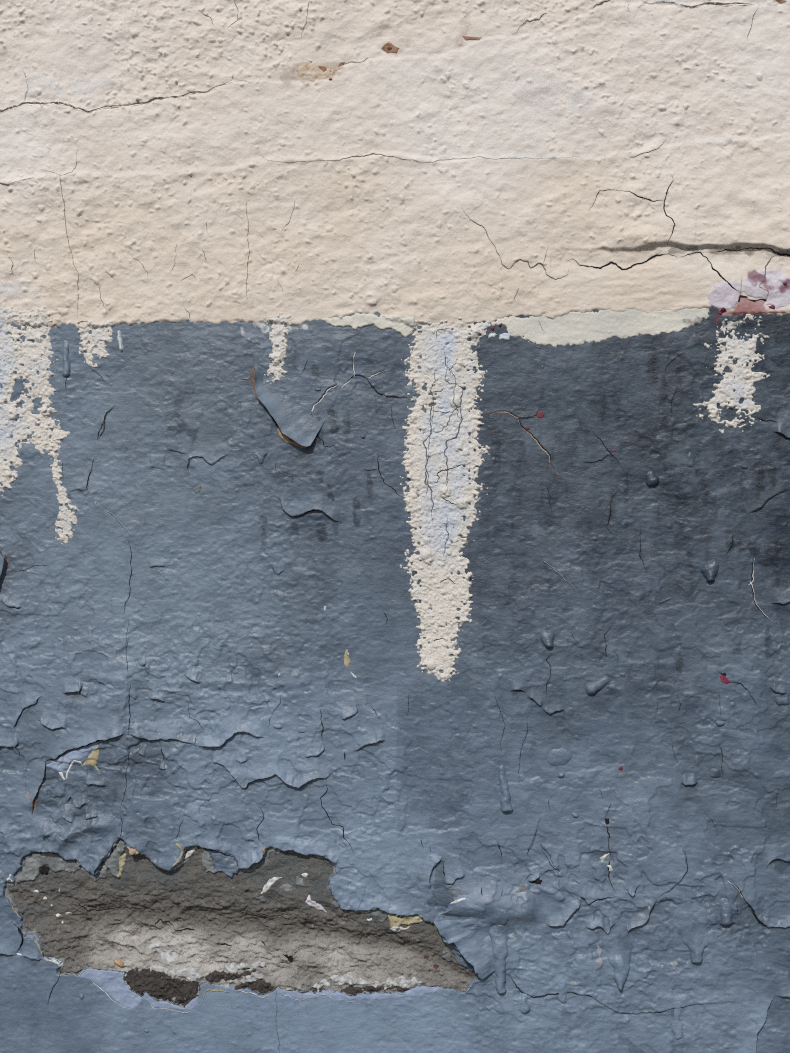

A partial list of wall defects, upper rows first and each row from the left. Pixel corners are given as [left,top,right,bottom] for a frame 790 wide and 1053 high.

crack [0,69,259,113]
crack [463,181,790,301]
peeling [708,268,790,315]
peeling [242,363,335,448]
peeling [774,413,790,439]
damp [400,314,491,683]
peeling [771,581,790,605]
spalling [0,673,515,1013]
peeling [545,880,656,934]